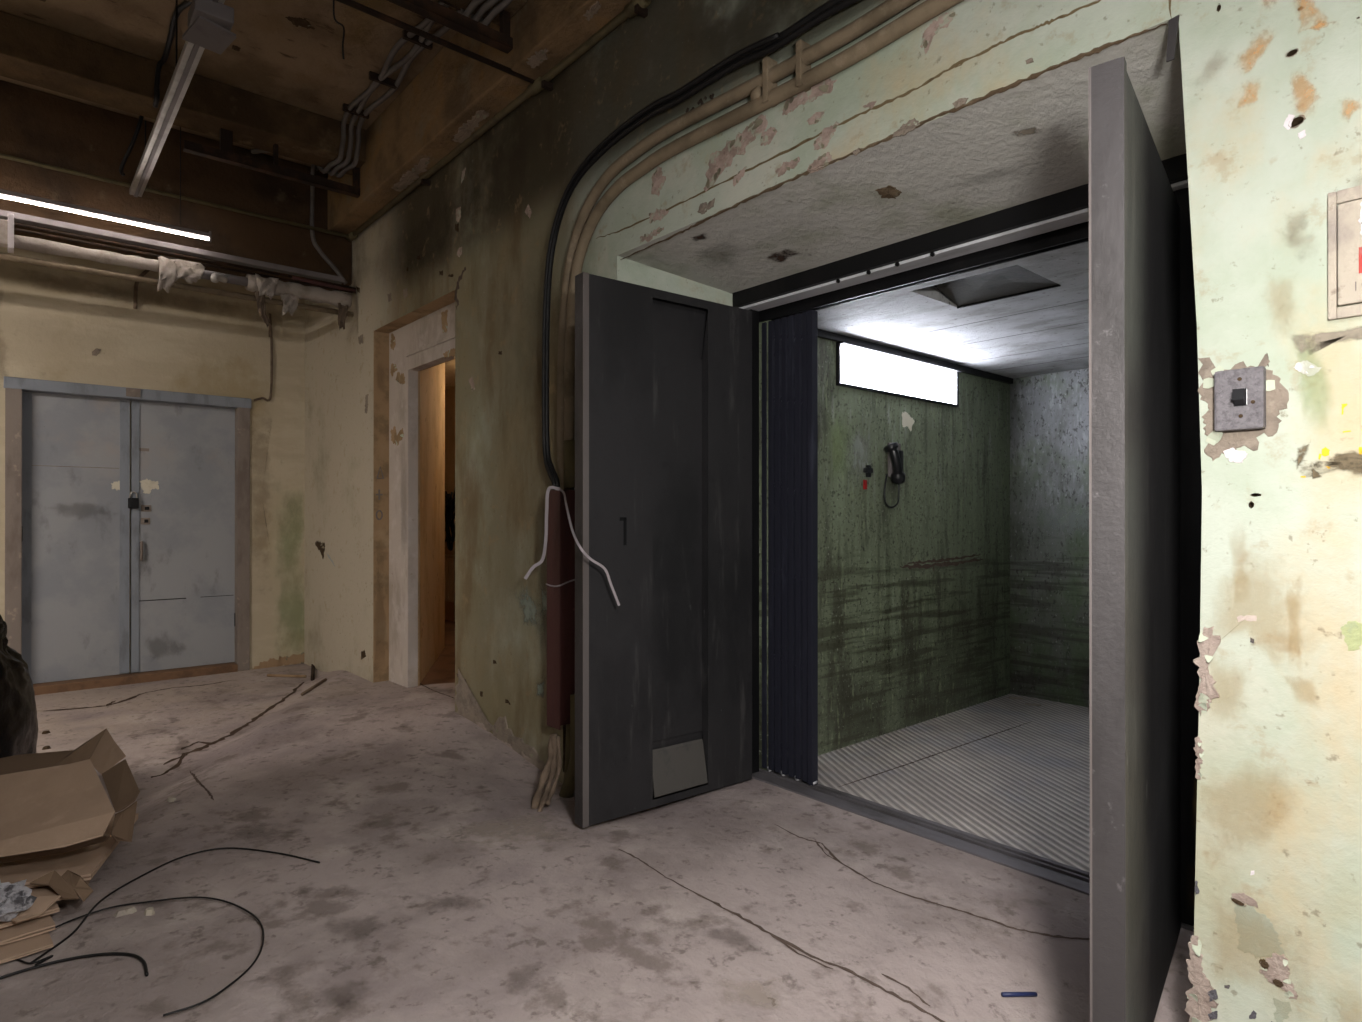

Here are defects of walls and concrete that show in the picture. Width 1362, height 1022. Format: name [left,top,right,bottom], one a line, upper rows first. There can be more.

spalling [620,23,1167,260]
peeling [1198,354,1289,463]
spalling [1193,626,1221,715]
crack [151,682,304,800]
spalling [1193,736,1204,780]
crack [619,849,945,1022]
crack [772,823,1090,940]
spalling [1185,935,1230,1022]
peeling [1231,893,1258,908]
peeling [1259,952,1298,1000]